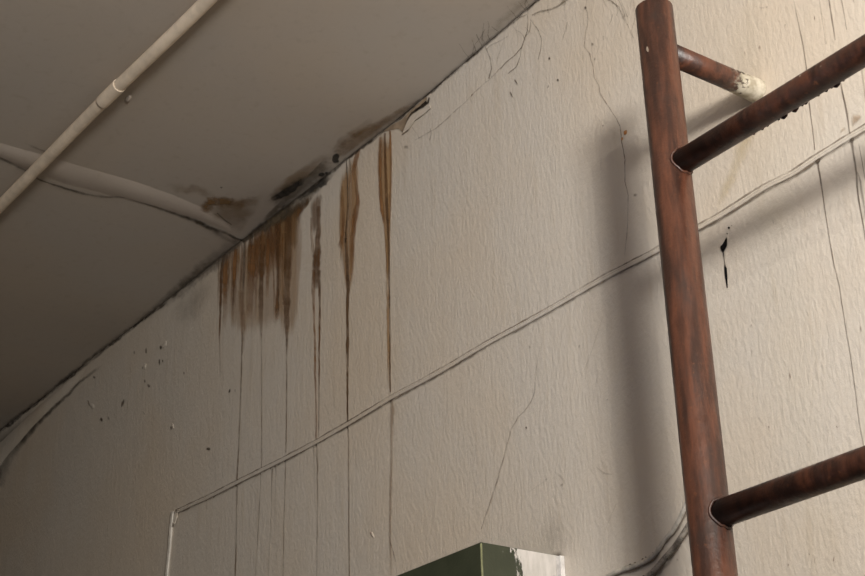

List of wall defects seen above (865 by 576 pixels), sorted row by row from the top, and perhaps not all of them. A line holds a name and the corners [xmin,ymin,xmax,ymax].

crack [5,366,82,427]
corrosion [219,199,321,382]
leakage [242,172,328,242]
crack [100,24,510,353]
corrosion [340,148,360,421]
corrosion [378,131,392,392]